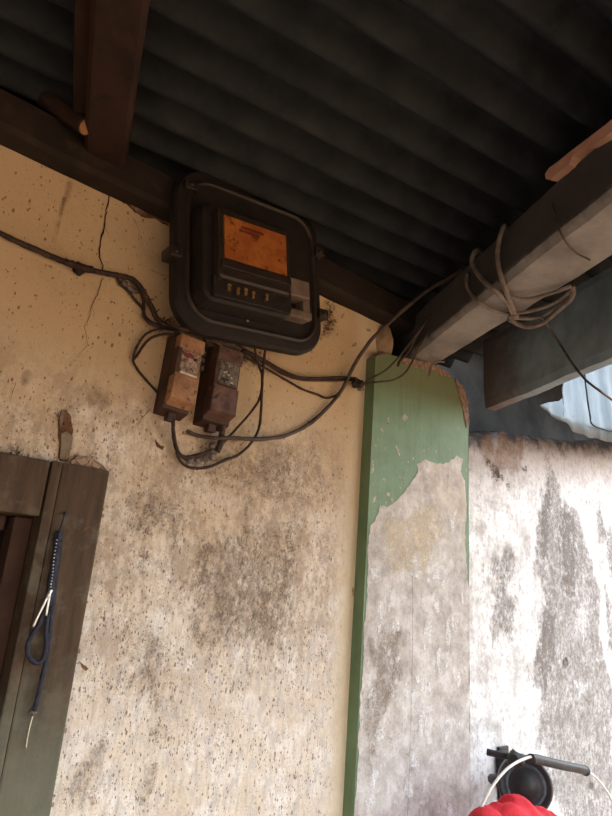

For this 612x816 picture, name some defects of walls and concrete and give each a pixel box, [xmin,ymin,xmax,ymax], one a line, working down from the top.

crack [77,196,111,356]
spalling [371,351,469,429]
leakage [192,528,297,642]
peeling [354,446,471,816]
leakage [490,545,515,636]
leakage [528,472,612,816]